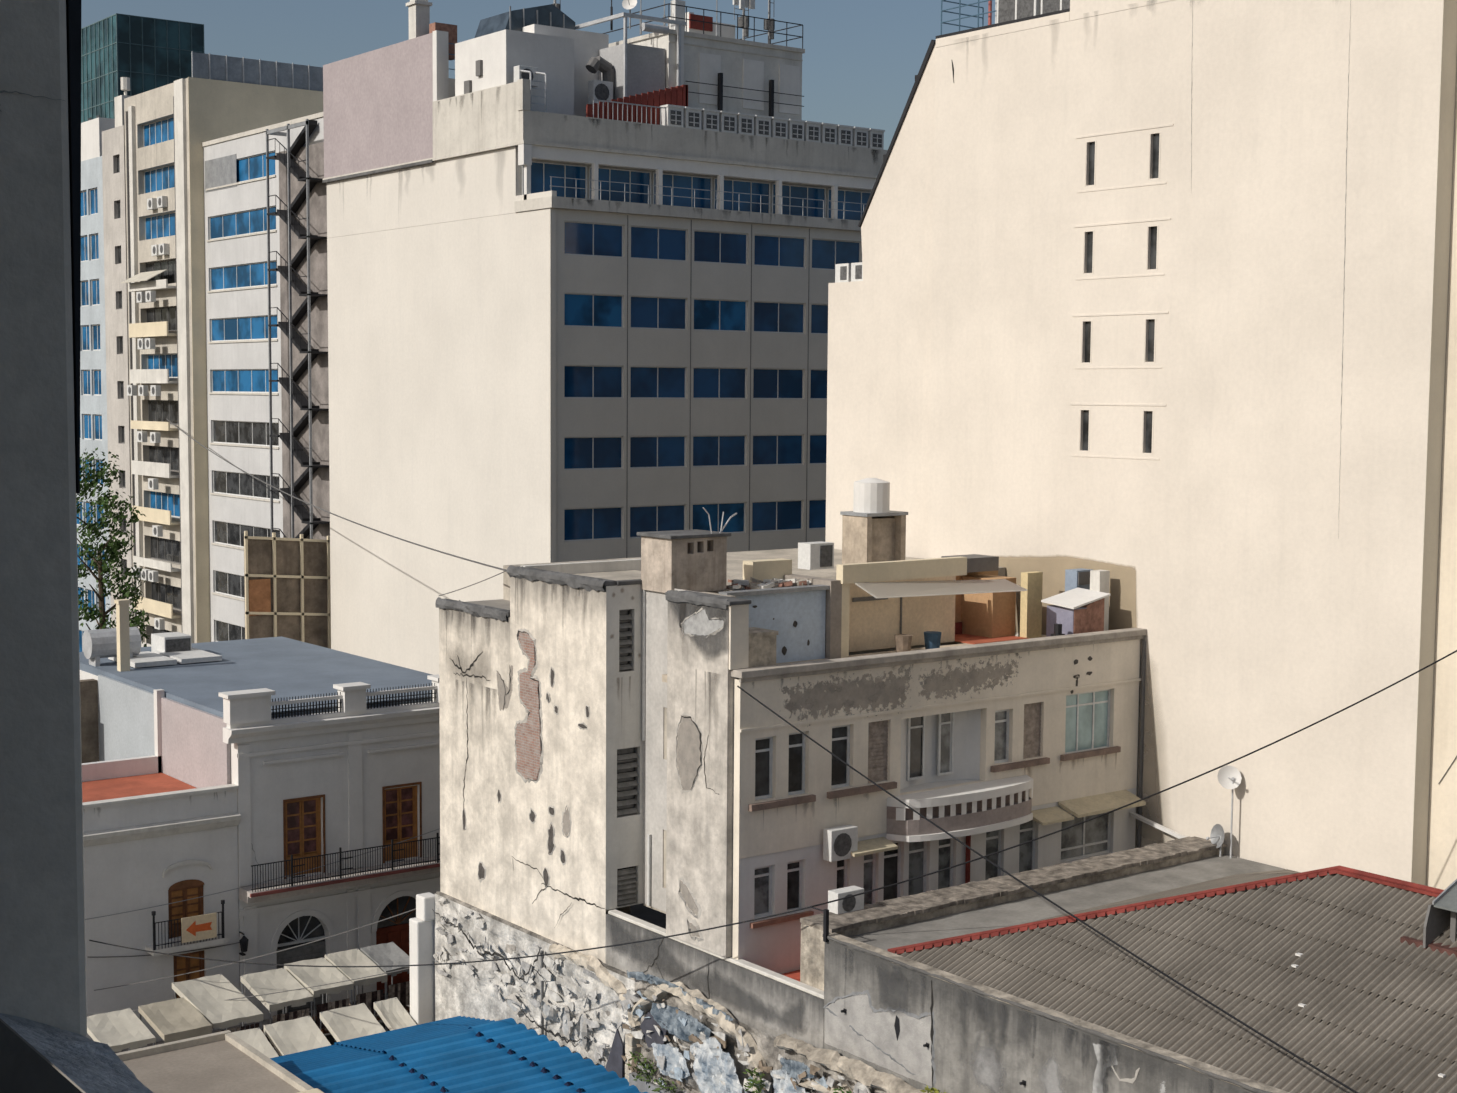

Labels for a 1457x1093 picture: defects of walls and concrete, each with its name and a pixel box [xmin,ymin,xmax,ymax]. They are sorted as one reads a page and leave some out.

peeling [680,608,726,638]
crack [451,653,490,822]
spalling [497,628,559,783]
spalling [675,713,703,793]
peeling [779,656,1020,727]